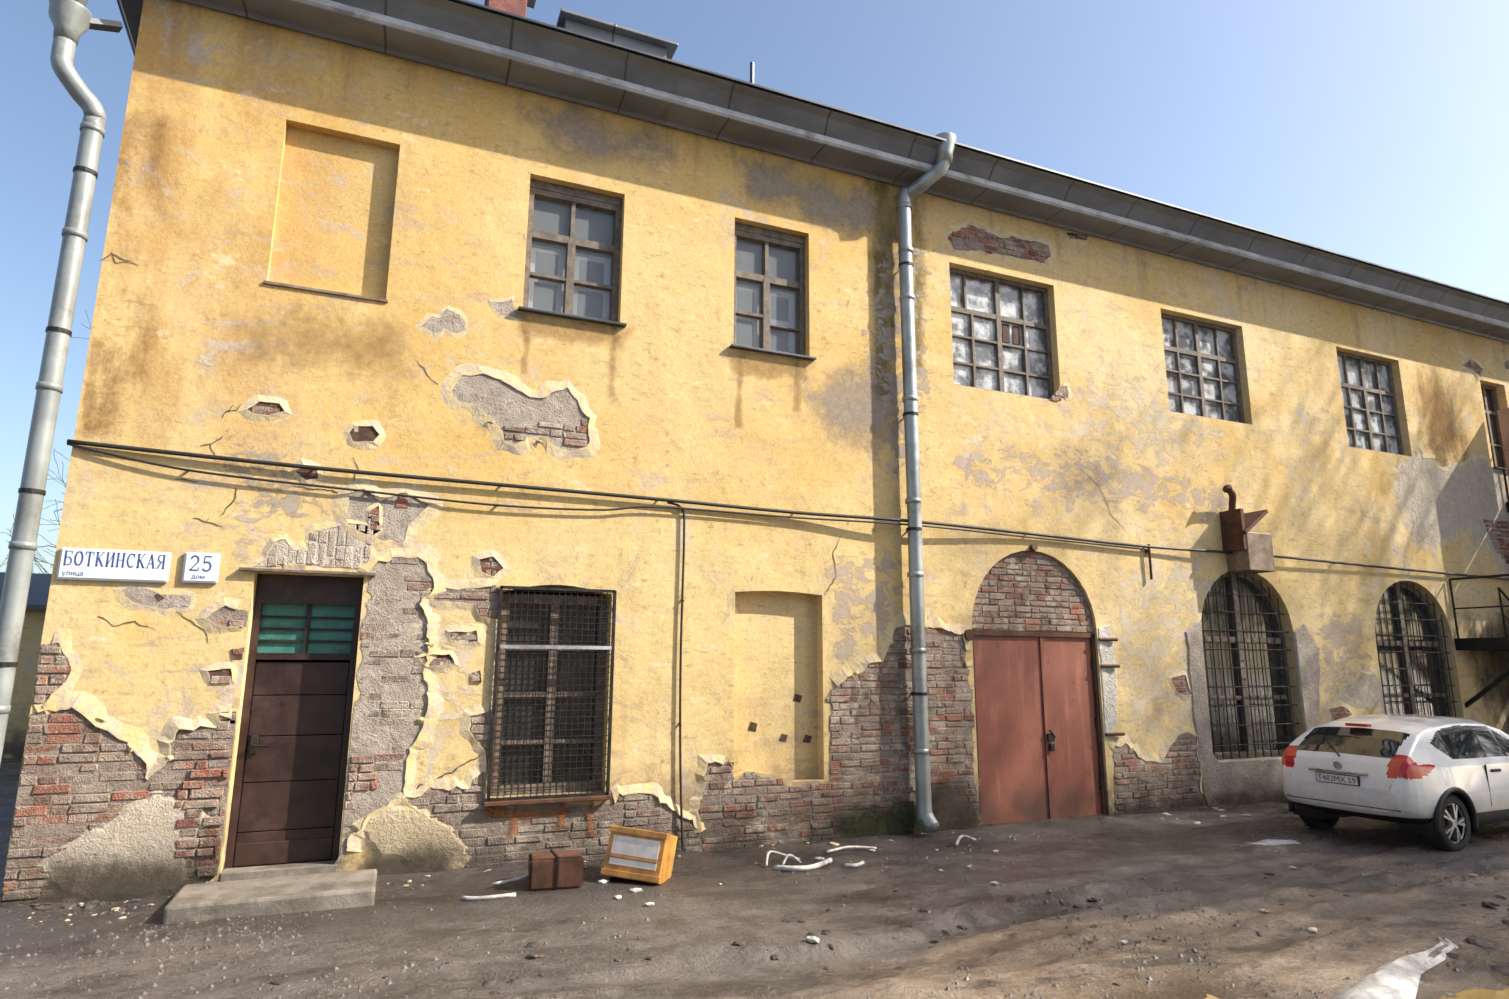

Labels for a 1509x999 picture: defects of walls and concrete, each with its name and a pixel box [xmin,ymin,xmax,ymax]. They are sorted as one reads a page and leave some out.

peeling [415,305,469,338]
flaking render [439,363,601,460]
leakage [748,164,894,396]
flaking render [0,628,236,907]
crack [98,612,208,643]
peeling [112,582,249,686]
flaking render [214,395,980,872]
flaking render [1107,542,1214,815]